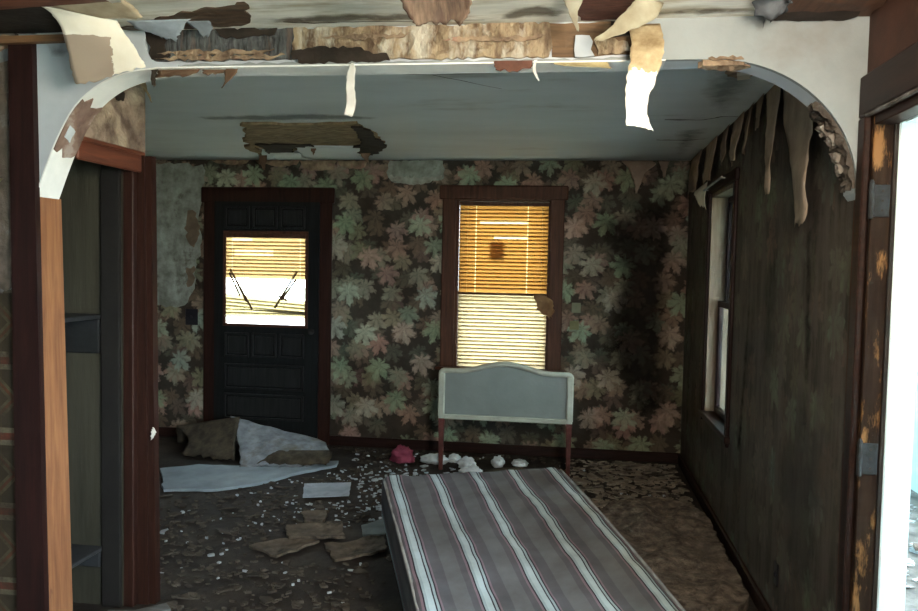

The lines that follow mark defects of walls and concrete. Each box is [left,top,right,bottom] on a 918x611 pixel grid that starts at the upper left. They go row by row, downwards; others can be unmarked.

flaking render [0,0,121,291]
spalling [54,21,632,170]
spalling [807,101,855,193]